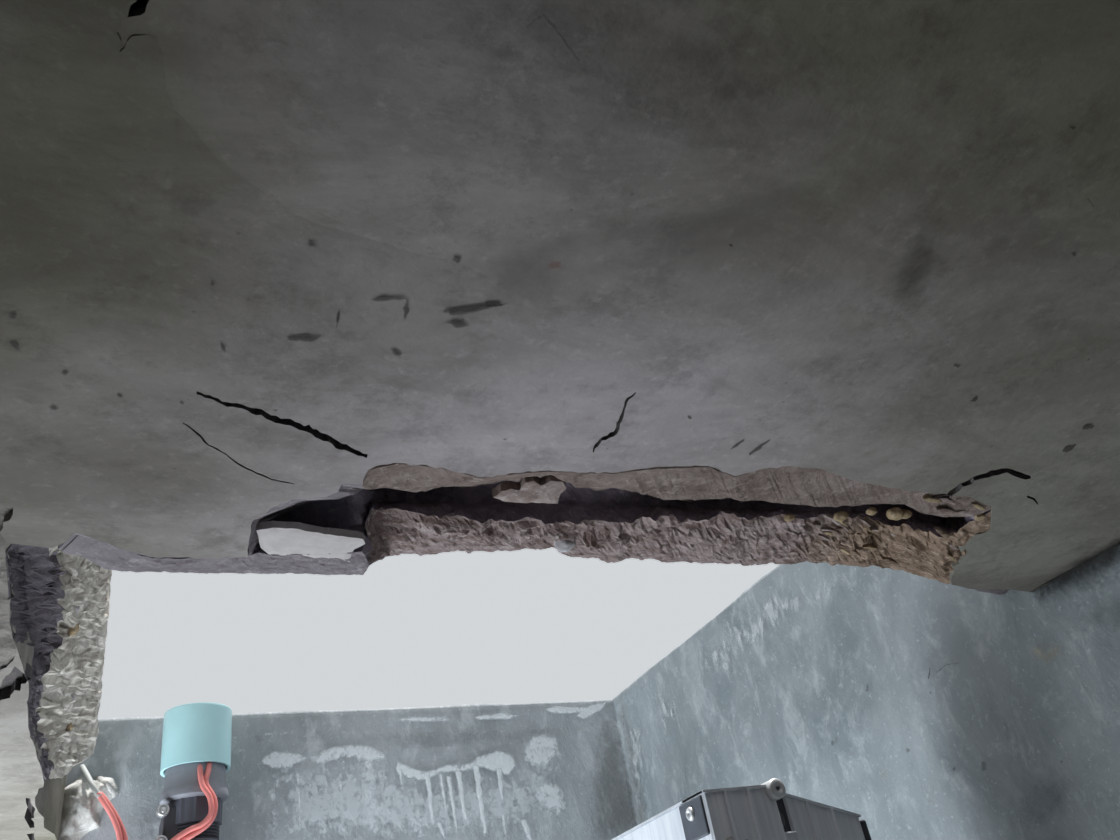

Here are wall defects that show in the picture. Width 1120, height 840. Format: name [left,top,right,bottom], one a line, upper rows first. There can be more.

crack [183,423,293,484]
crack [197,391,368,458]
crack [593,392,636,452]
crack [932,468,1038,504]
spalling [0,463,991,780]
crack [0,663,33,700]
damp [262,736,565,840]